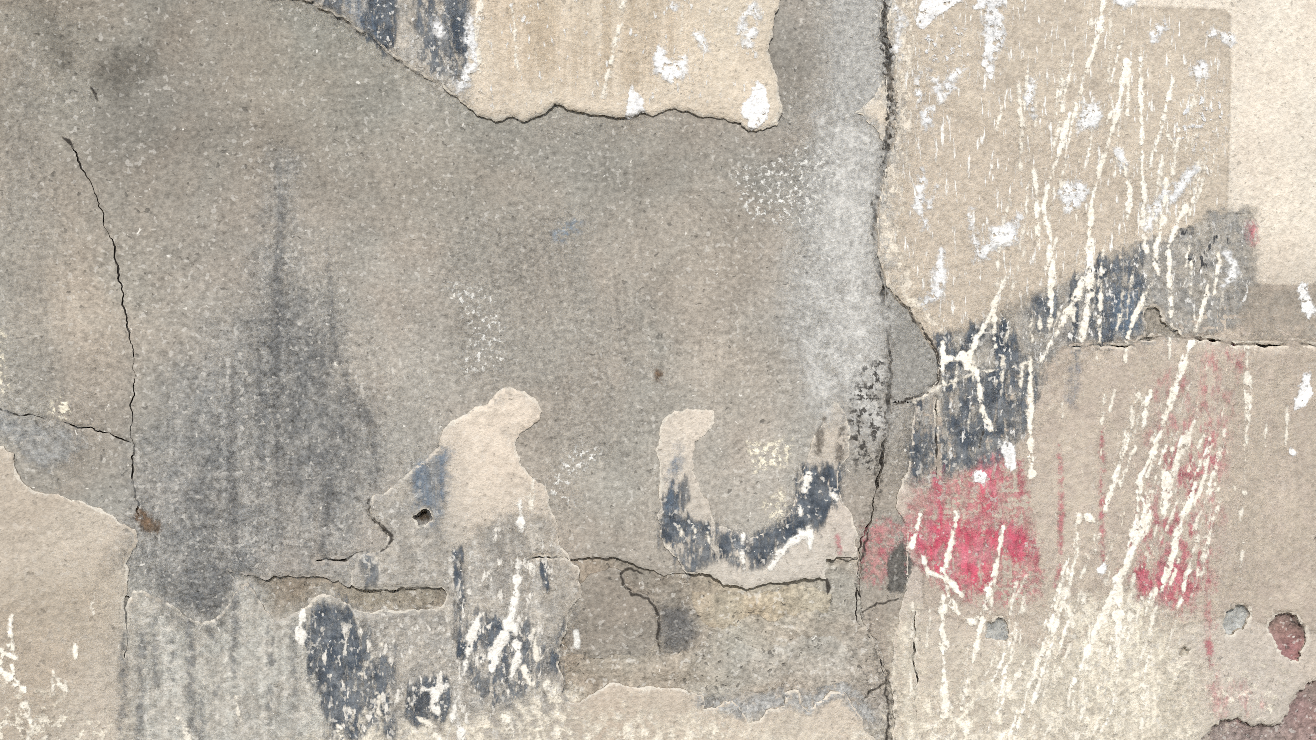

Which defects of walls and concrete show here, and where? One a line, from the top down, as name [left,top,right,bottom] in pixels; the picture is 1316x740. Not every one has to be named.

crack [0,137,140,516]
peeling [0,0,941,740]
crack [826,0,941,740]
crack [1192,336,1316,347]
crack [316,498,394,562]
crack [620,567,660,648]
spalling [1268,612,1306,662]
spalling [1201,681,1316,740]